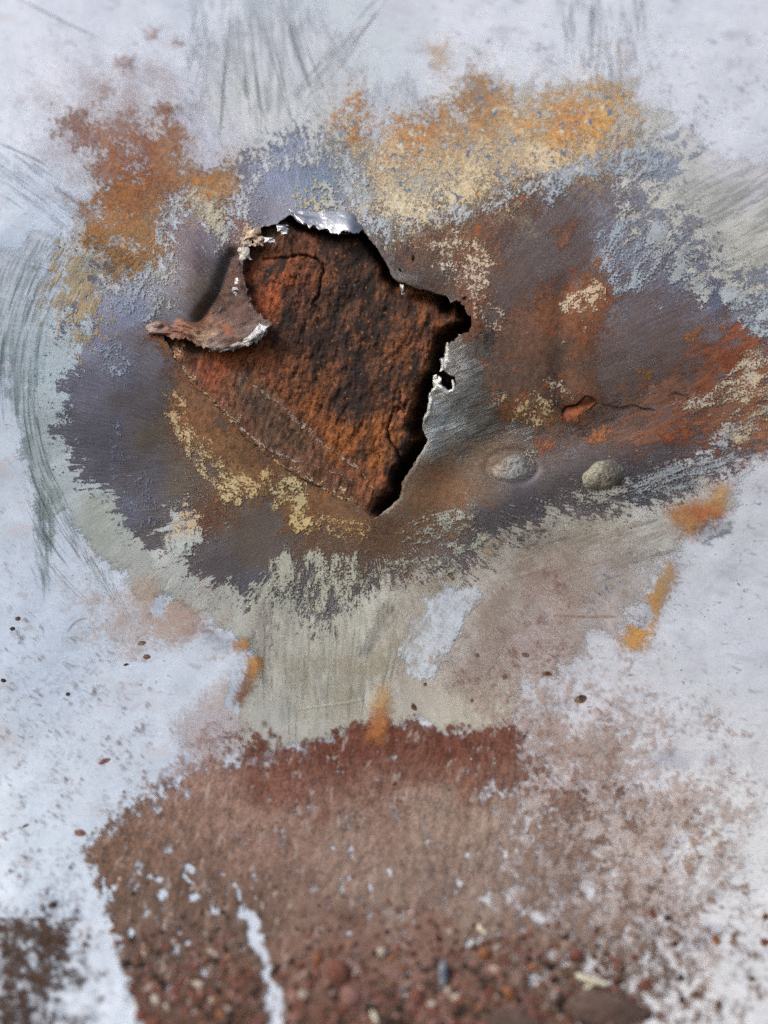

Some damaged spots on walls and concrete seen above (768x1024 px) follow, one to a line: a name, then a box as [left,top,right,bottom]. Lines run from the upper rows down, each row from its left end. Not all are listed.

rust [34,55,247,364]
peeling [0,4,768,754]
rust [143,42,768,589]
rust [620,562,679,652]